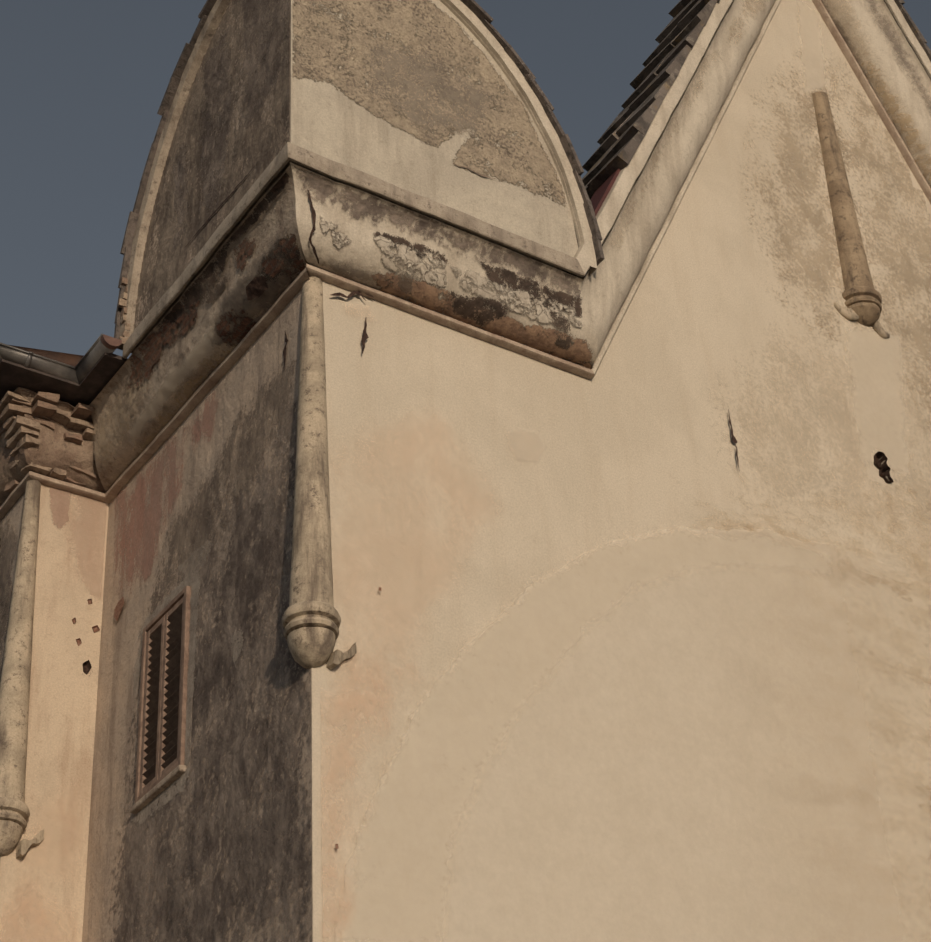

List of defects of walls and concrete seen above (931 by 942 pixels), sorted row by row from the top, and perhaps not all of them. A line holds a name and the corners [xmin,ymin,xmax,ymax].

leakage [200,0,290,209]
spalling [292,0,567,207]
spalling [125,173,306,391]
crack [307,190,319,264]
peeling [319,217,351,249]
crack [331,291,374,354]
spalling [372,236,593,369]
leakage [148,360,297,613]
crack [728,409,740,472]
hole [874,451,894,483]
leakage [229,722,308,942]